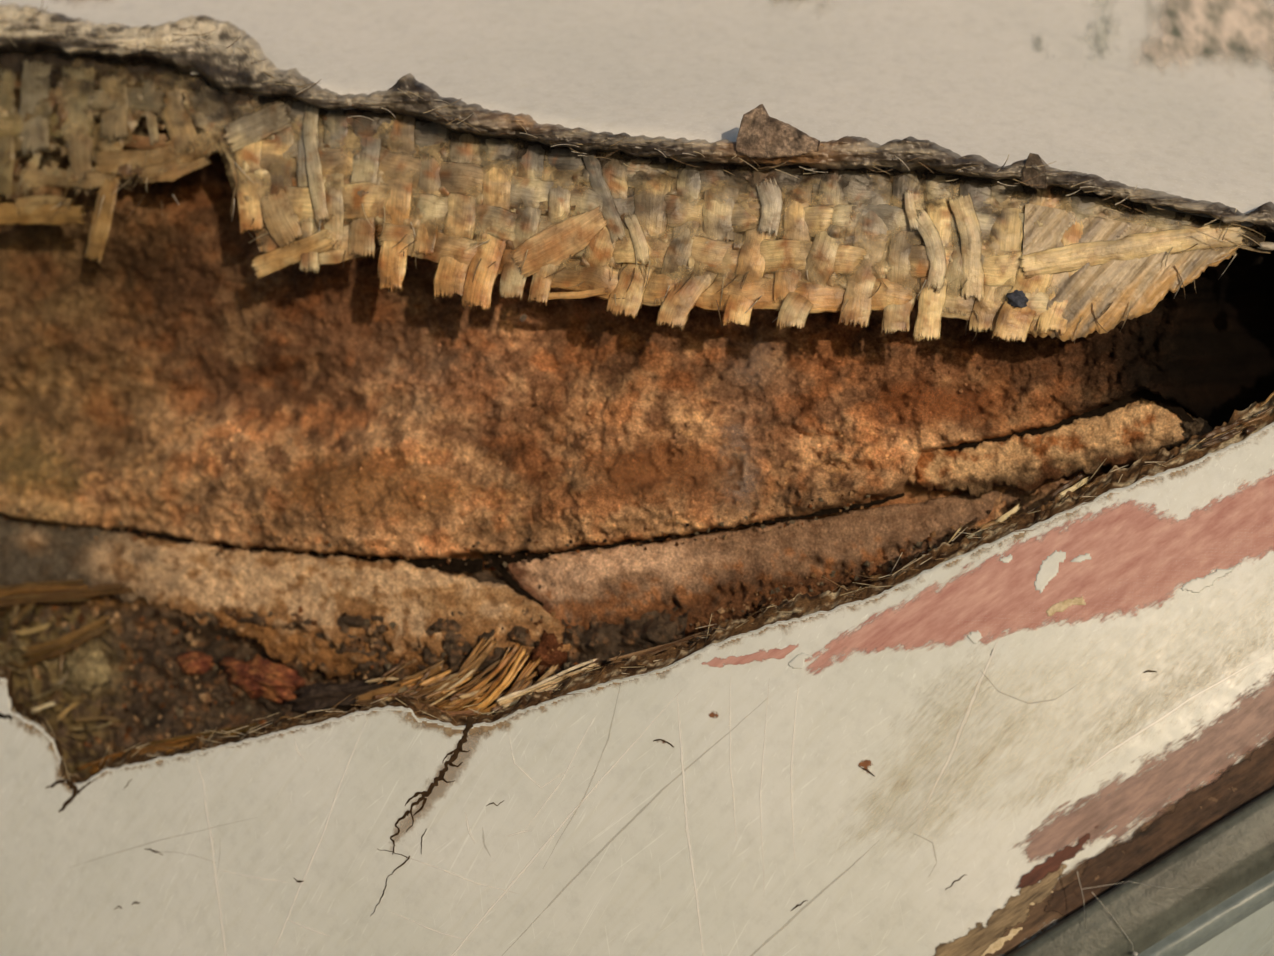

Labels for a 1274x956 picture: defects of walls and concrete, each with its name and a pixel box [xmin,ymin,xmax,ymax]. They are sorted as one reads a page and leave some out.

peeling [1143,0,1274,65]
peeling [736,104,820,159]
peeling [1021,153,1047,189]
crack [931,389,1199,452]
crack [0,493,905,606]
peeling [702,471,1274,674]
crack [371,716,474,915]
peeling [1015,674,1274,861]